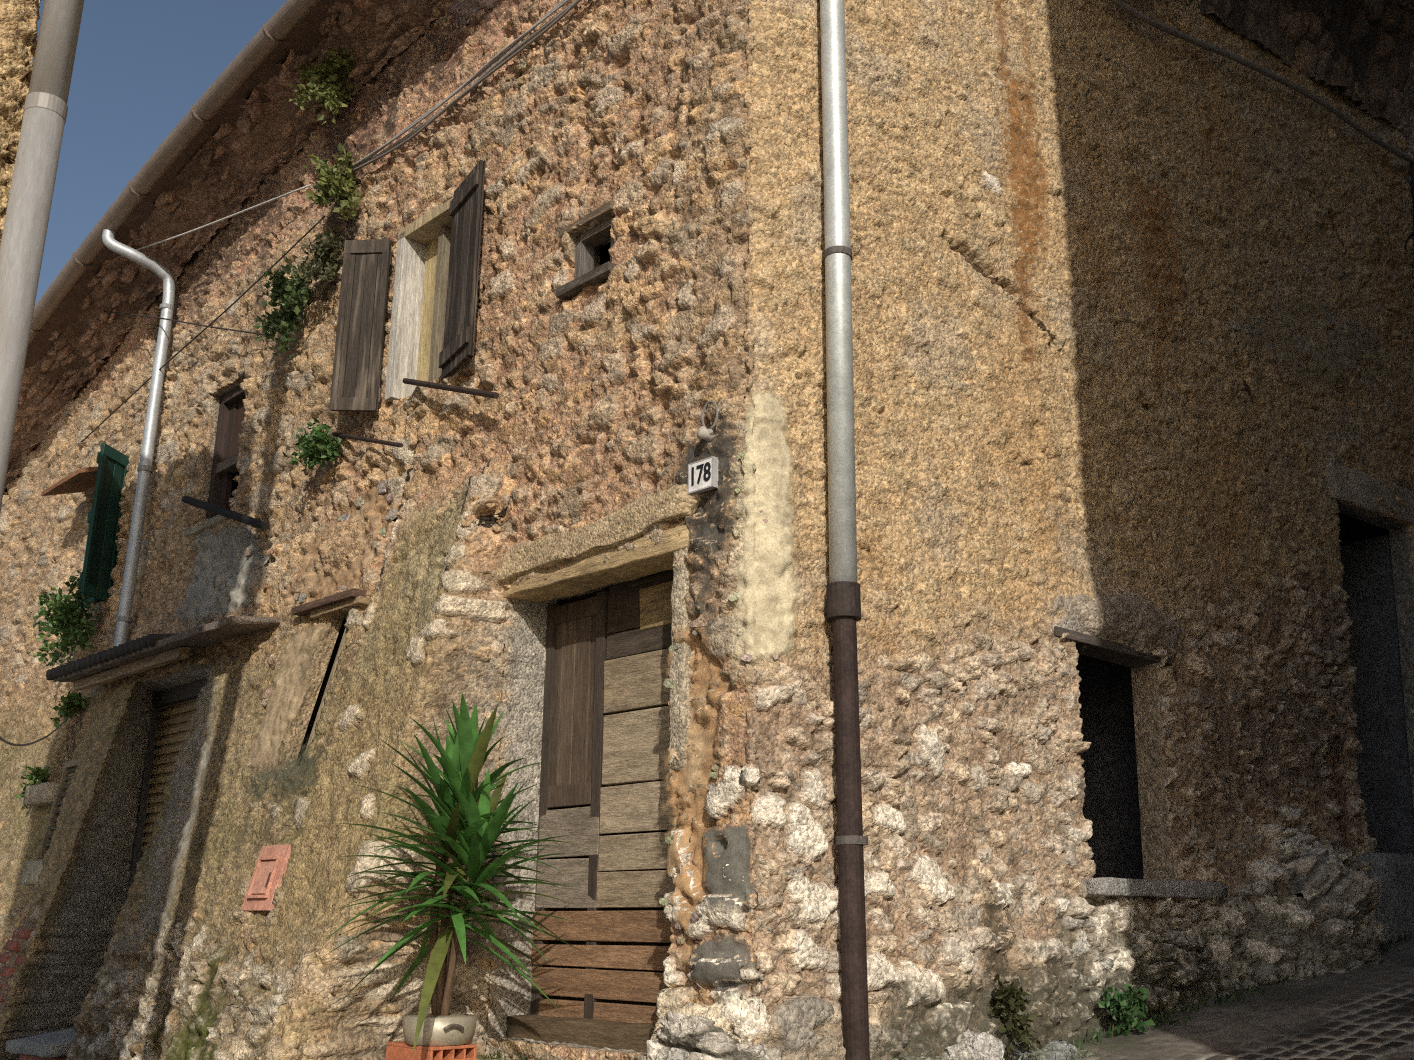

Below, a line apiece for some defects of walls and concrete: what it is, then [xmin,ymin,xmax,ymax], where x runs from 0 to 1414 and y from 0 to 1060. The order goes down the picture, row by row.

corrosion [997,2,1047,360]